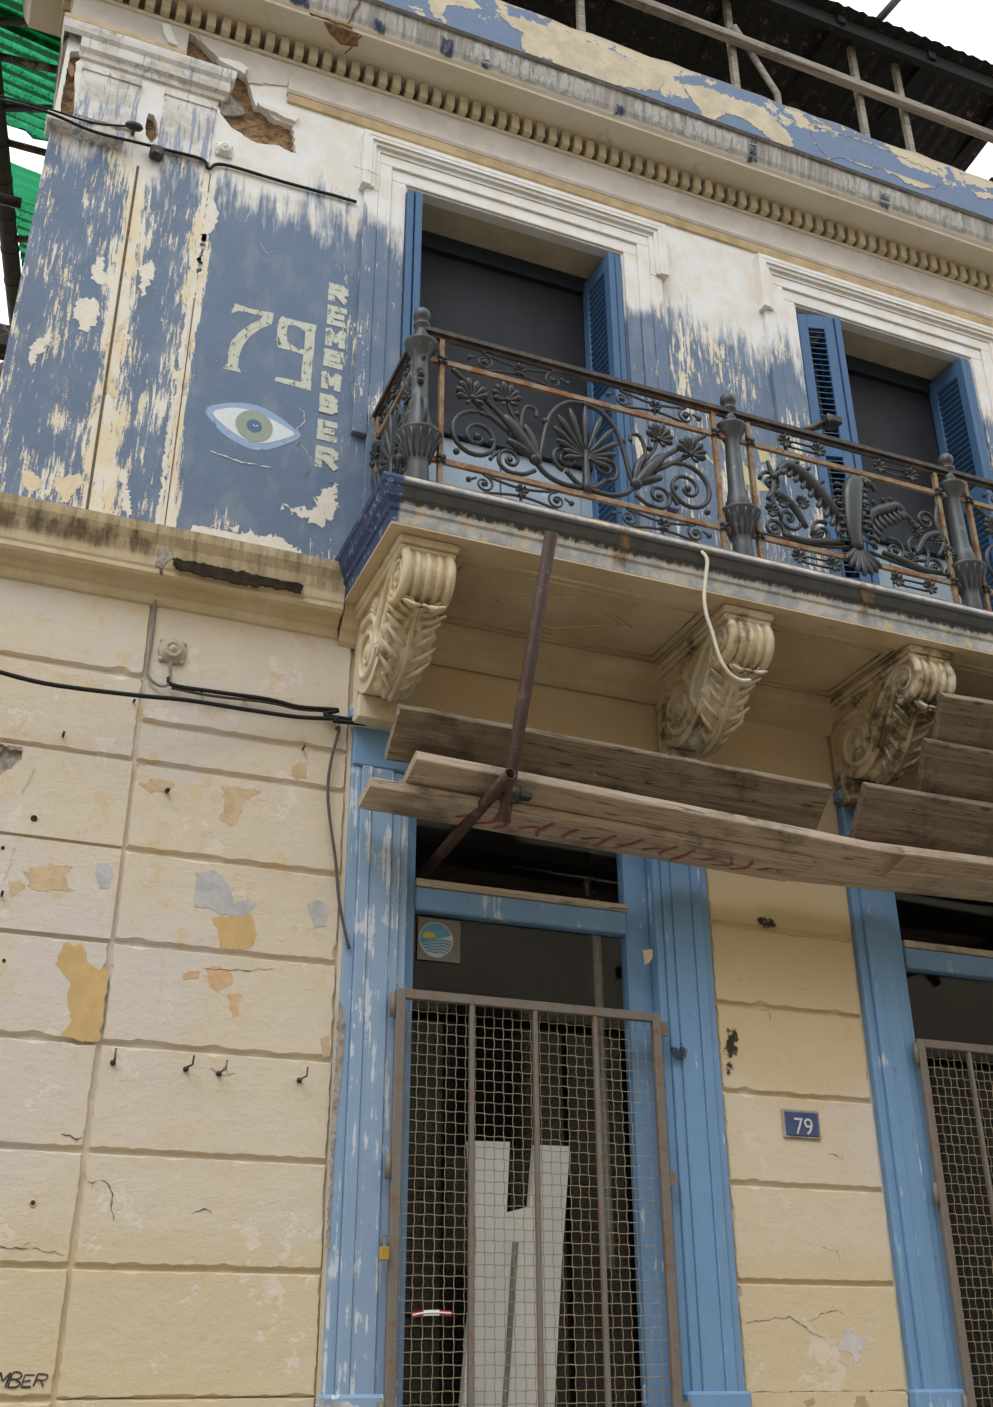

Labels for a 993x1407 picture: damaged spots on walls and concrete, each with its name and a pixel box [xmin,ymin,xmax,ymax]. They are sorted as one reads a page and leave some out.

peeling [428,0,482,24]
peeling [500,15,667,91]
flaking render [162,23,299,153]
peeling [682,84,795,148]
peeling [808,124,943,189]
peeling [281,482,341,528]
flaking render [0,745,23,775]
peeling [219,786,260,826]
peeling [9,863,74,897]
peeling [194,870,257,950]
peeling [56,942,109,1042]
peeling [182,965,242,1018]